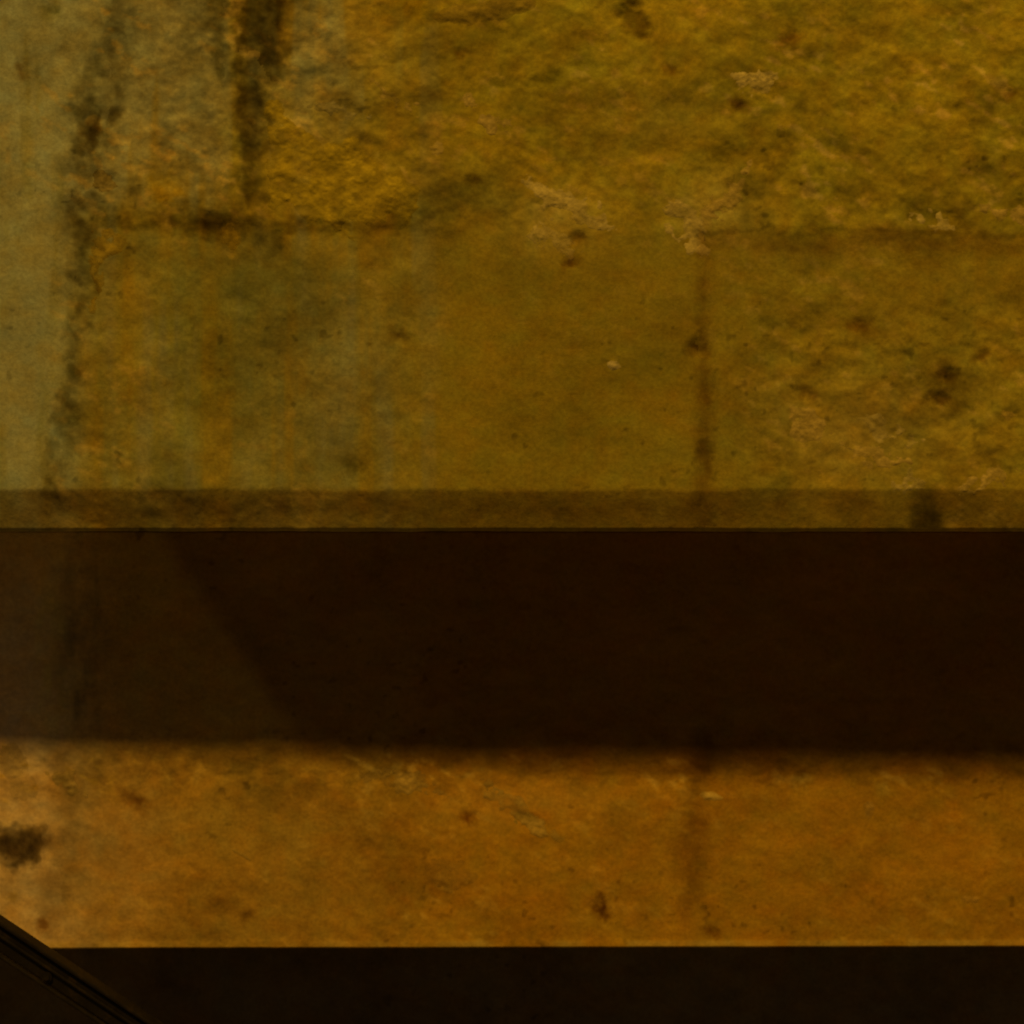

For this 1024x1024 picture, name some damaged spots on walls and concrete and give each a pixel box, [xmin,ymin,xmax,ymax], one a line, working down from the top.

damp [0,831,38,866]